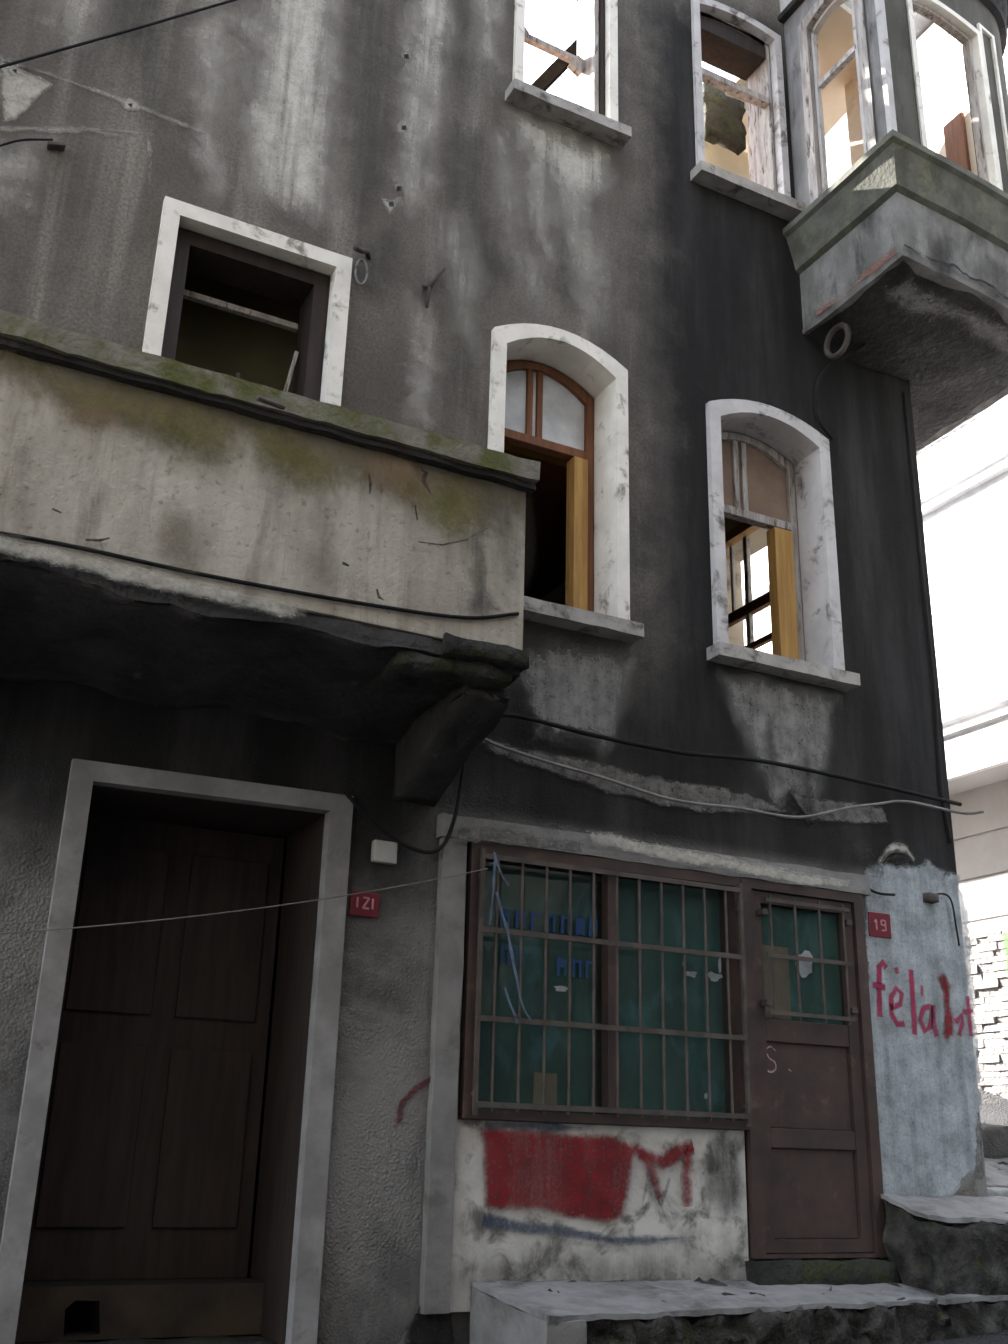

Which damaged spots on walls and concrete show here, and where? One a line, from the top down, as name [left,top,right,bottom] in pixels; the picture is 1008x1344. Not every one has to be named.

leakage [417,0,445,86]
leakage [252,0,325,203]
spalling [482,739,887,824]